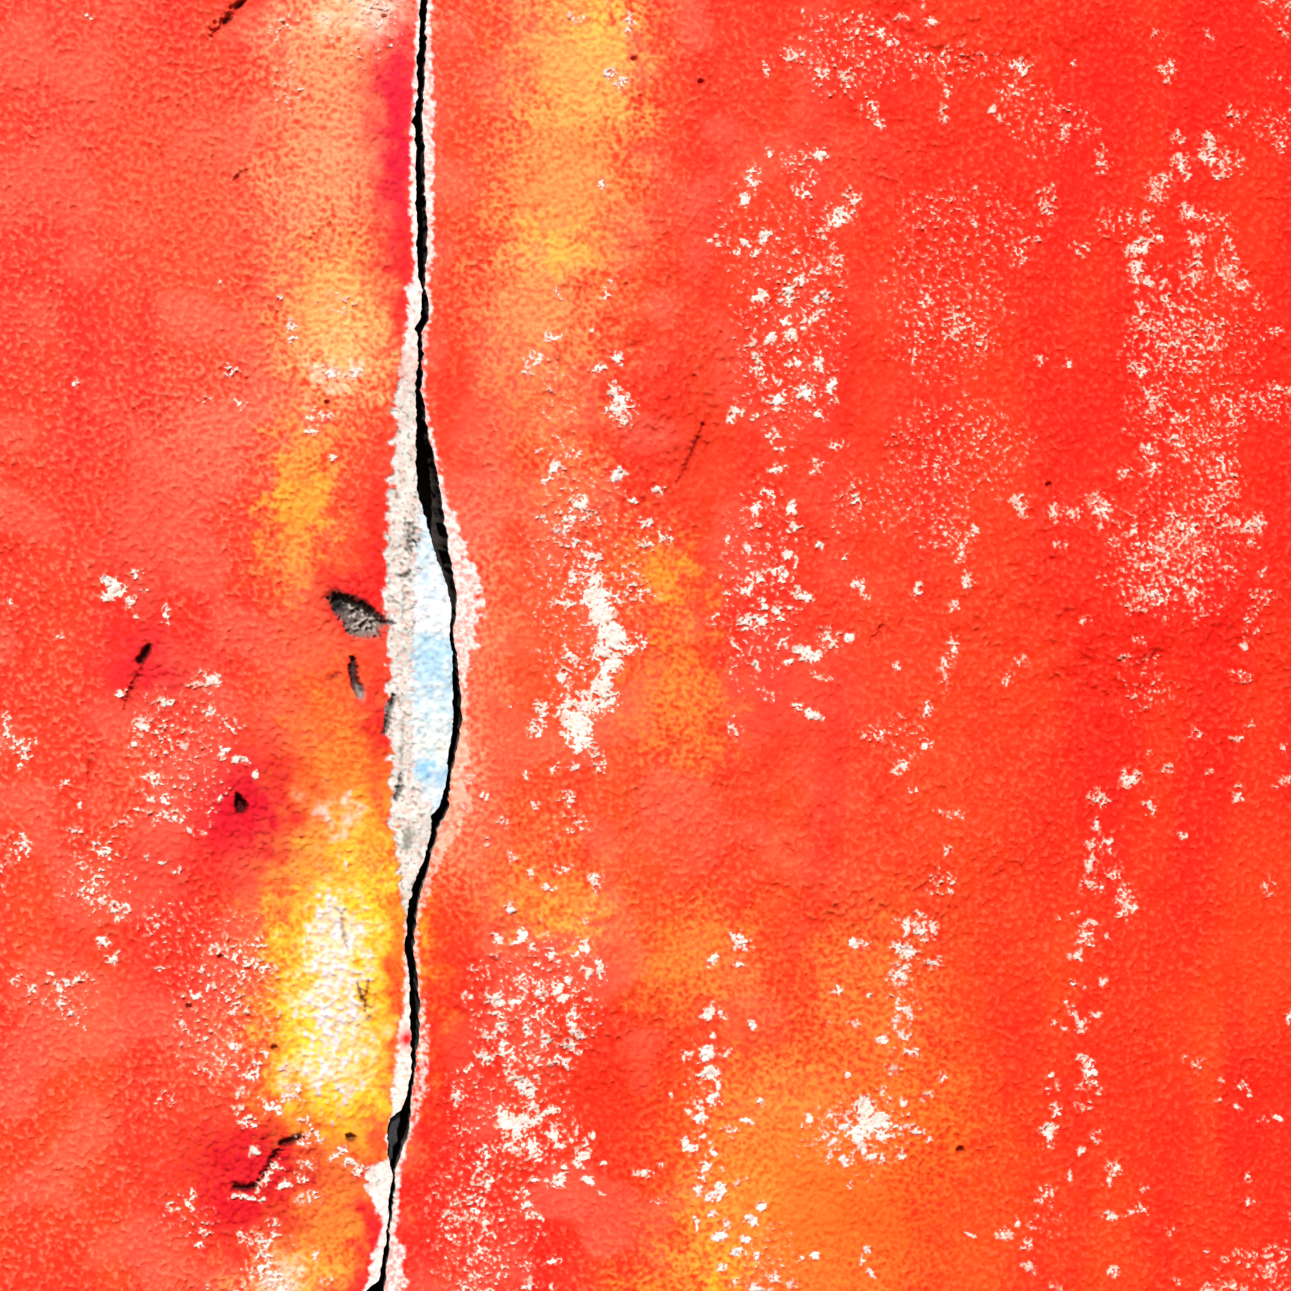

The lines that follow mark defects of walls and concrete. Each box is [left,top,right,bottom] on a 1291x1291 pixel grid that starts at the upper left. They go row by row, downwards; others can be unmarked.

spalling [62,0,489,1291]
crack [366,0,463,1291]
peeling [0,711,37,770]
peeling [0,832,32,893]
peeling [10,969,95,1031]